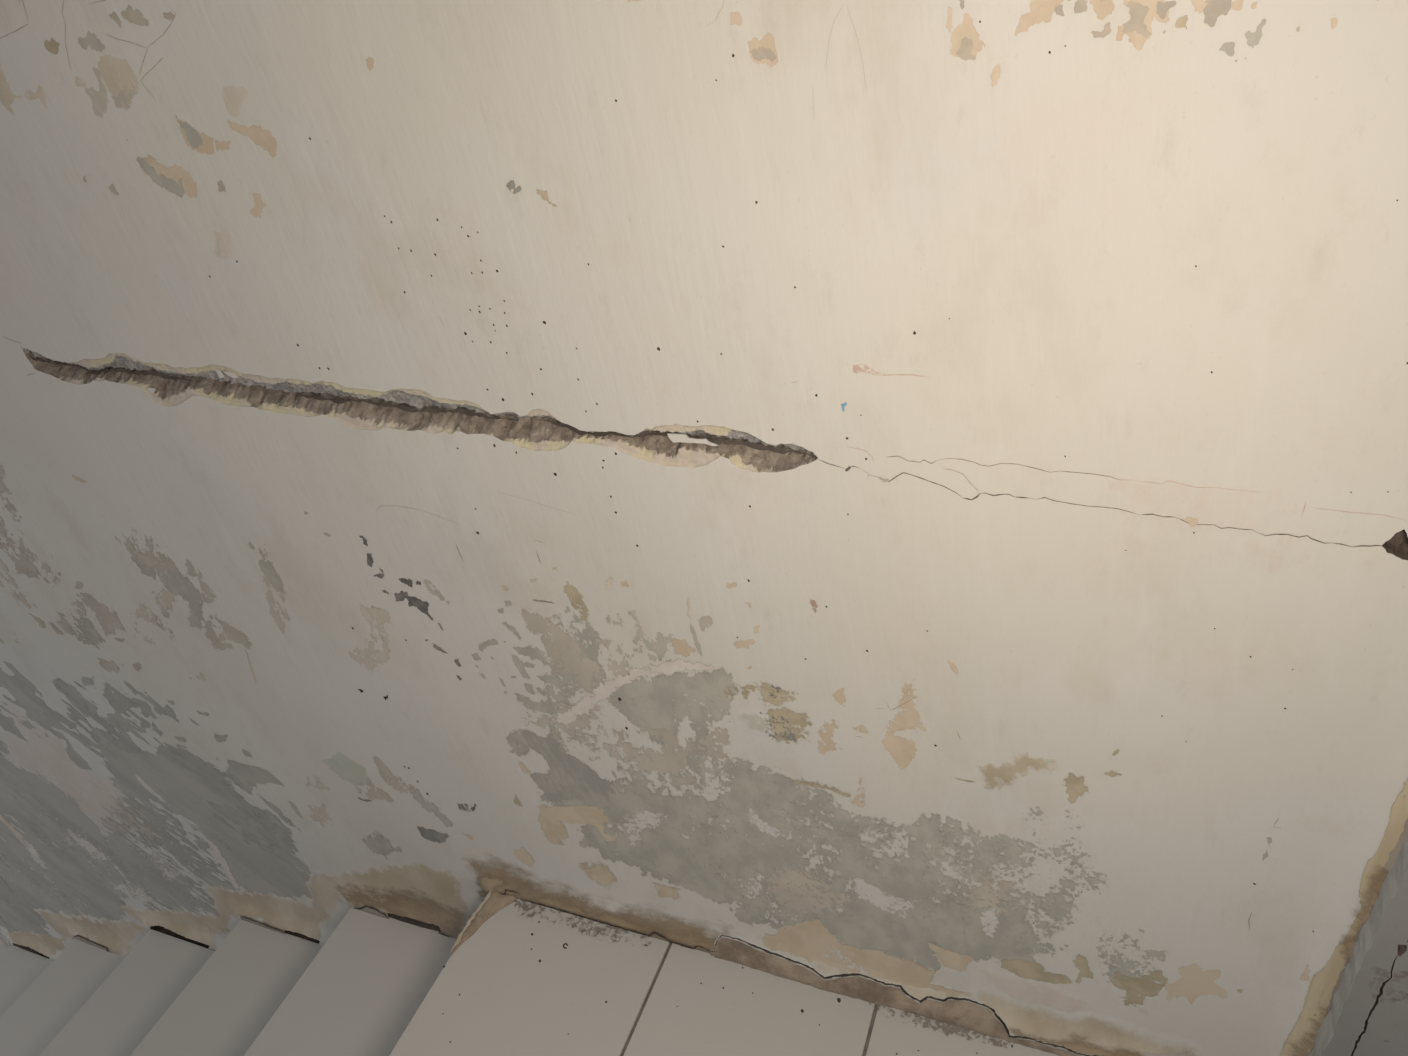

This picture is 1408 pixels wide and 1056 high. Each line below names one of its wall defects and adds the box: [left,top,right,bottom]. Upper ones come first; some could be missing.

peeling [44,0,176,118]
peeling [946,0,985,61]
peeling [1015,0,1266,62]
peeling [176,86,277,157]
peeling [136,154,197,198]
crack [818,447,1403,547]
peeling [0,465,476,937]
peeling [349,536,1243,1015]
crack [502,889,1103,1056]
water stain [808,960,1215,1056]
crack [1351,941,1408,1056]